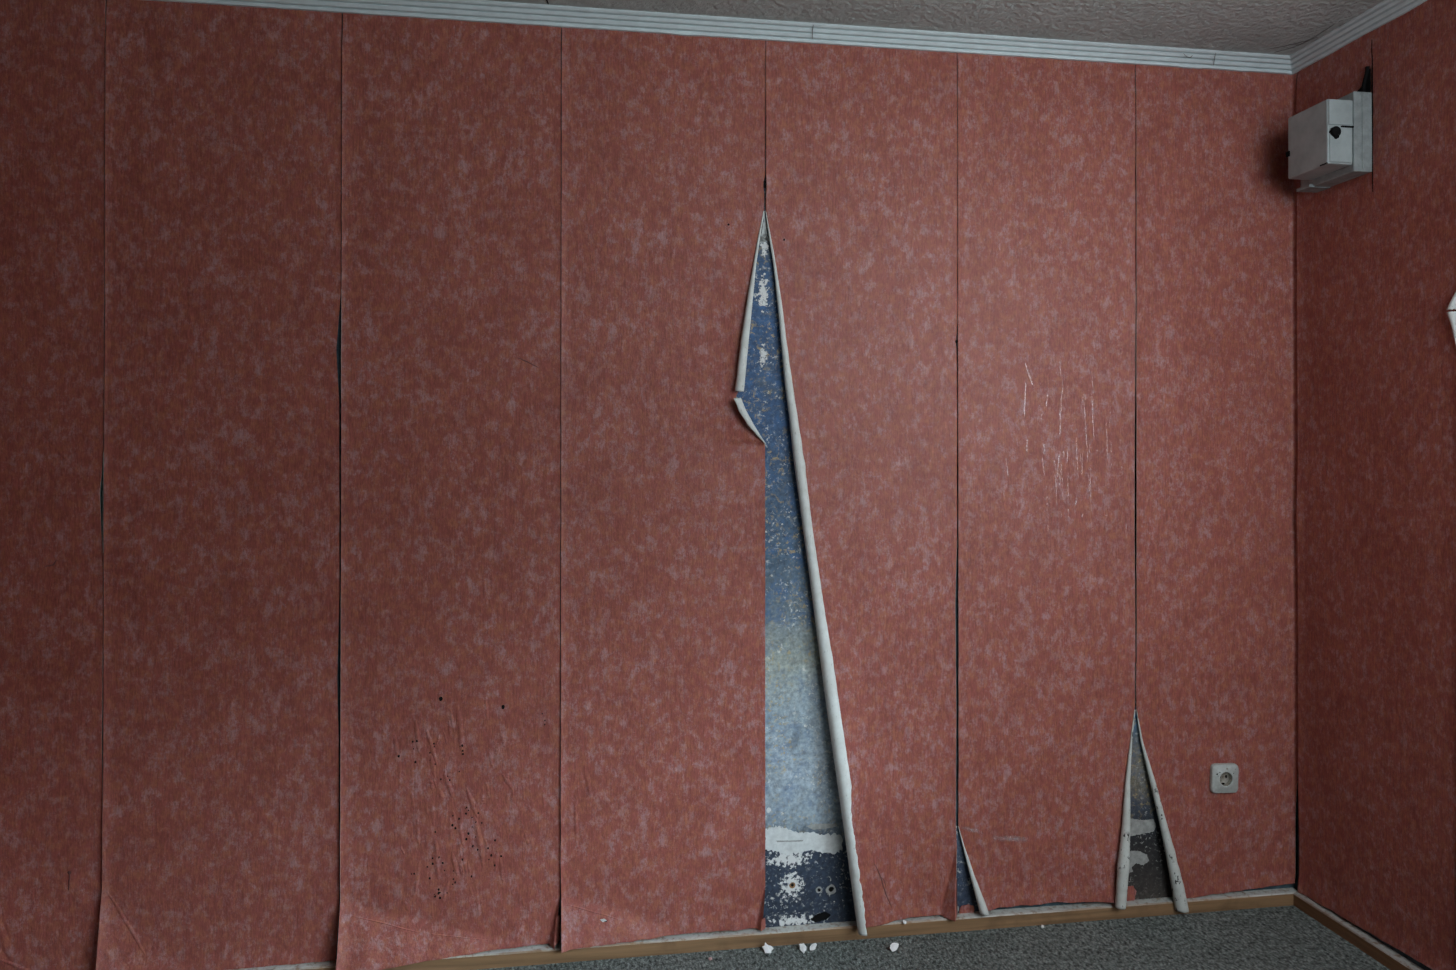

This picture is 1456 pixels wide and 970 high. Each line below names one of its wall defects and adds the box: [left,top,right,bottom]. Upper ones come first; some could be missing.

flaking render [736,183,856,928]
flaking render [955,540,979,913]
flaking render [1128,334,1173,900]